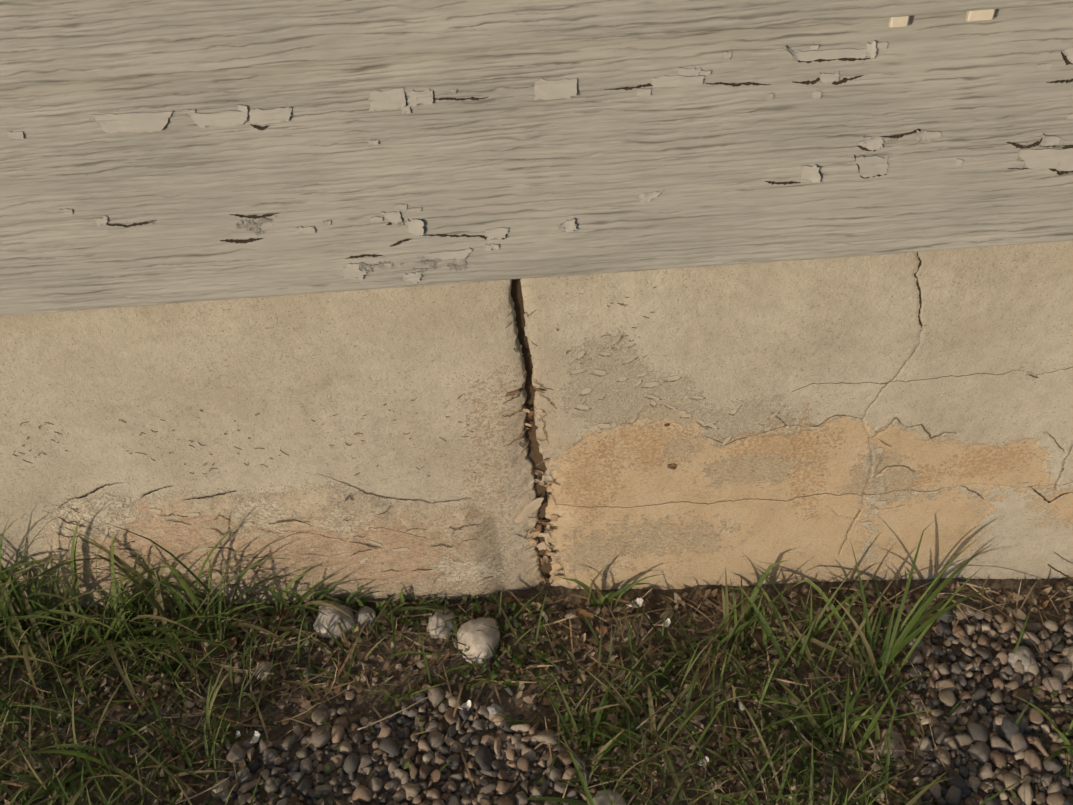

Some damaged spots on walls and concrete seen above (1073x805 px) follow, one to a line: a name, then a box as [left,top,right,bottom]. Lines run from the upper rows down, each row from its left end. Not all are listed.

peeling [90,104,292,133]
peeling [368,88,488,114]
peeling [604,67,774,100]
peeling [783,41,888,99]
peeling [1006,133,1073,175]
peeling [220,213,278,244]
peeling [343,204,509,285]
crack [502,253,1073,585]
crack [59,483,116,538]
crack [142,486,236,500]
crack [319,474,471,504]
peeling [528,404,1073,590]